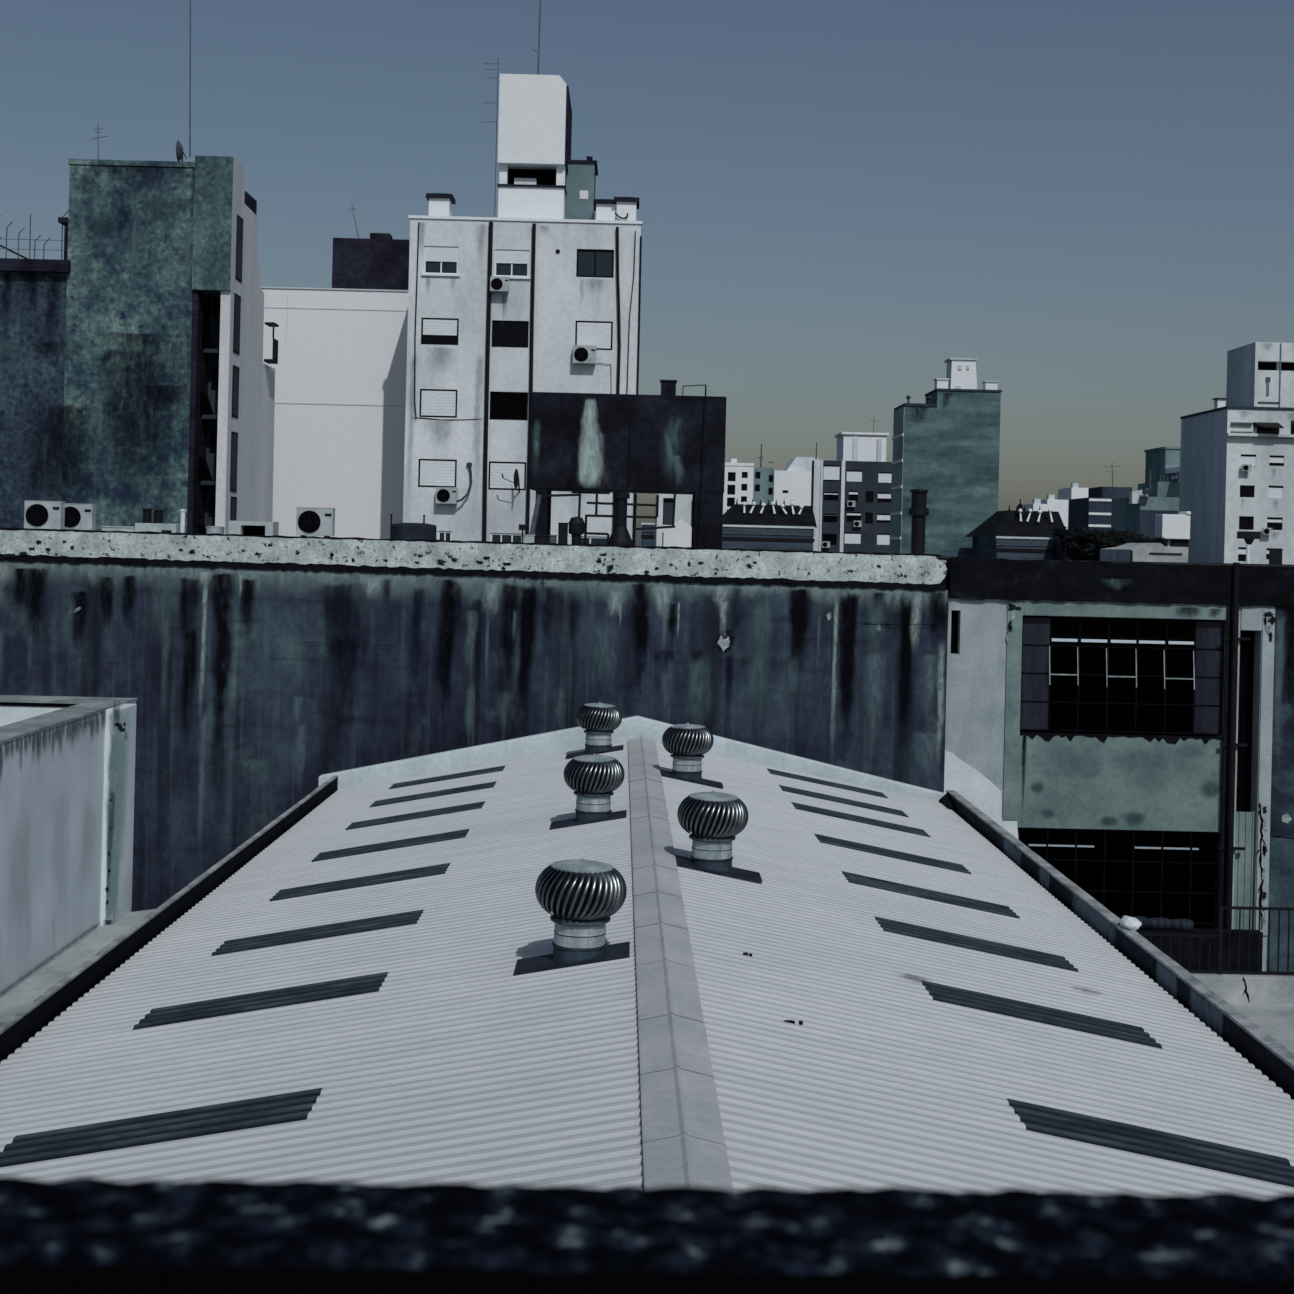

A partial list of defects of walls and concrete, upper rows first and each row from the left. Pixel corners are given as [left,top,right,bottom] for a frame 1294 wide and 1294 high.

leakage [44,333,178,468]
leakage [0,560,948,799]
leakage [1276,609,1294,697]
leakage [0,701,129,995]